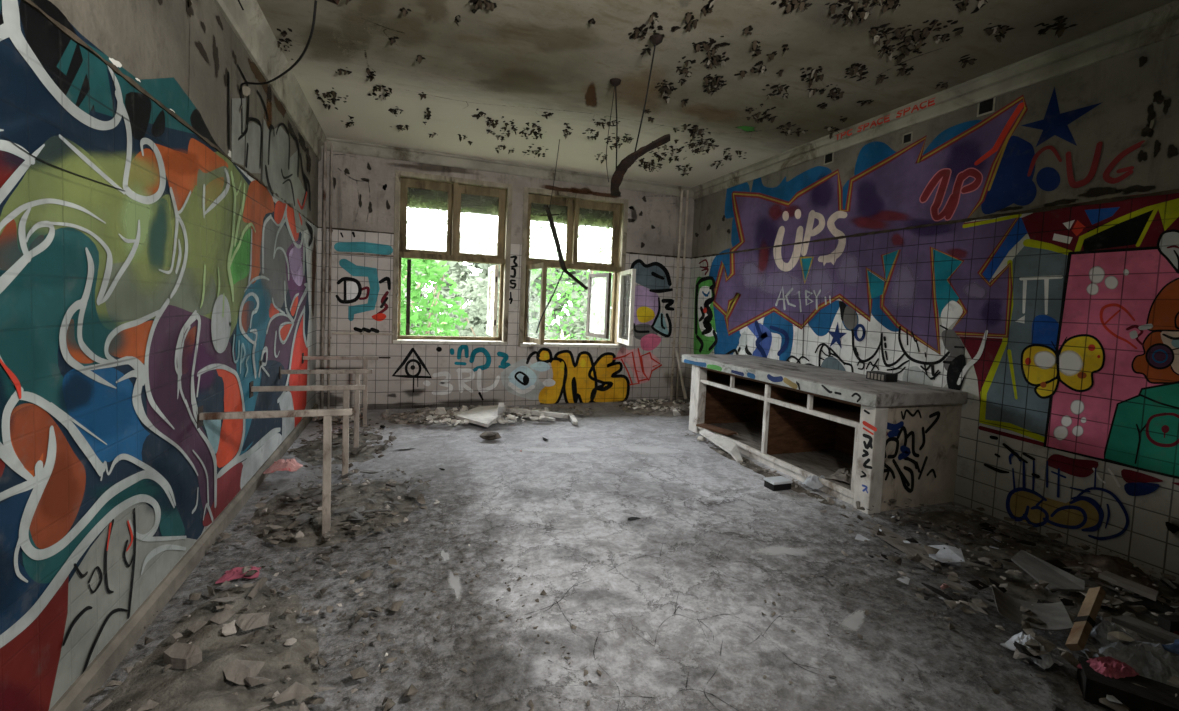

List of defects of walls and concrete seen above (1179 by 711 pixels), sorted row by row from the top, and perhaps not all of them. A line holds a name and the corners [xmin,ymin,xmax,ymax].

peeling [454,0,497,26]
peeling [1034,16,1079,38]
peeling [186,0,311,172]
peeling [314,67,354,128]
peeling [366,68,408,132]
peeling [418,92,436,138]
peeling [471,108,554,157]
peeling [562,119,634,164]
peeling [635,124,747,176]
peeling [628,0,988,137]